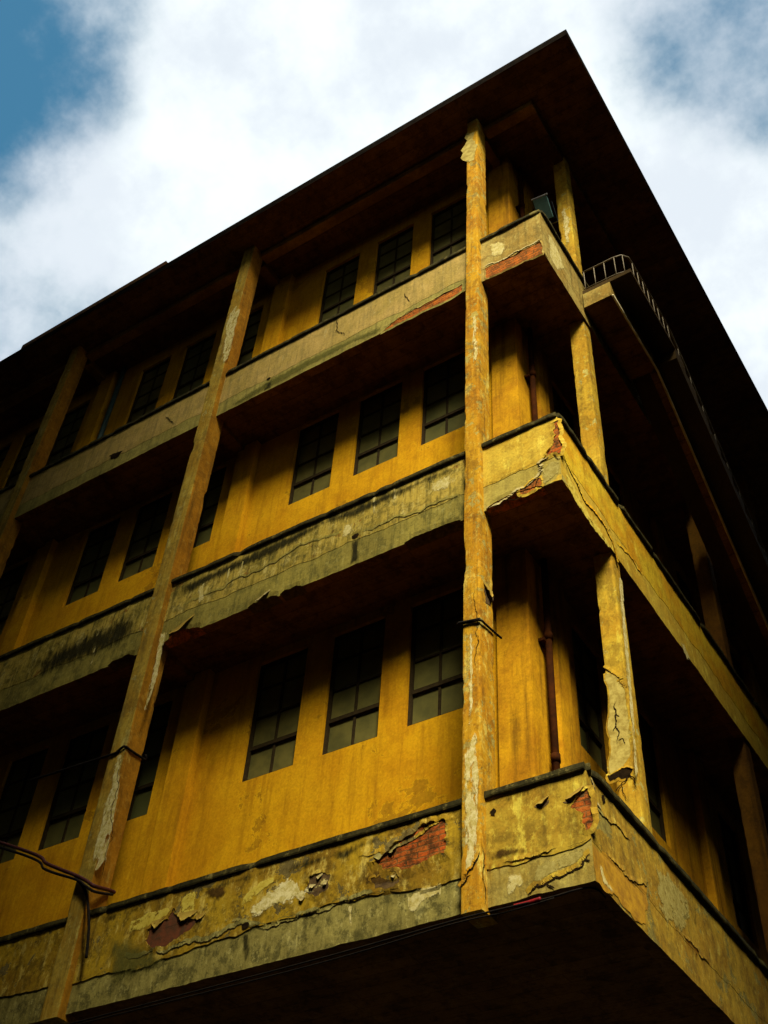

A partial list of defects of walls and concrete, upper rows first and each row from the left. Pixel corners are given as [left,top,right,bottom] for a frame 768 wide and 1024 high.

peeling [461,132,478,162]
flaking render [484,240,544,279]
crack [486,452,643,576]
spalling [163,614,206,648]
spalling [248,585,307,614]
crack [603,664,627,743]
spalling [129,891,206,956]
peeling [225,868,335,922]
crack [126,820,442,959]
flaking render [367,733,496,895]
crack [458,774,648,903]
spalling [533,785,690,932]